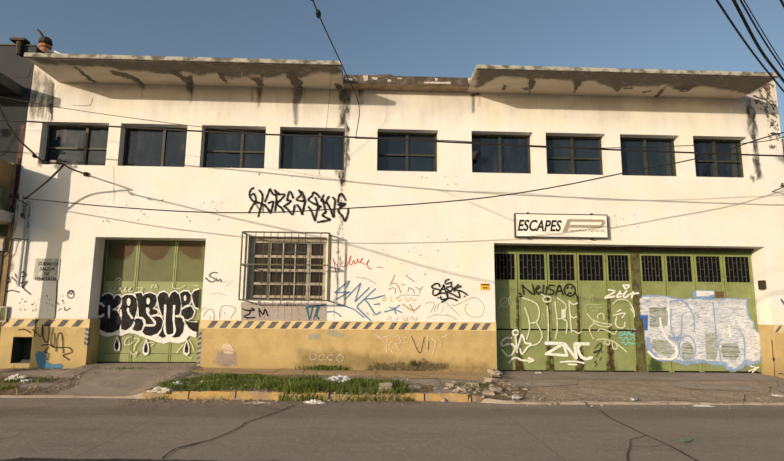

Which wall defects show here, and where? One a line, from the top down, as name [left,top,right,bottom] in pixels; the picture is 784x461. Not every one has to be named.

leakage [335,90,350,184]
leakage [746,84,781,180]